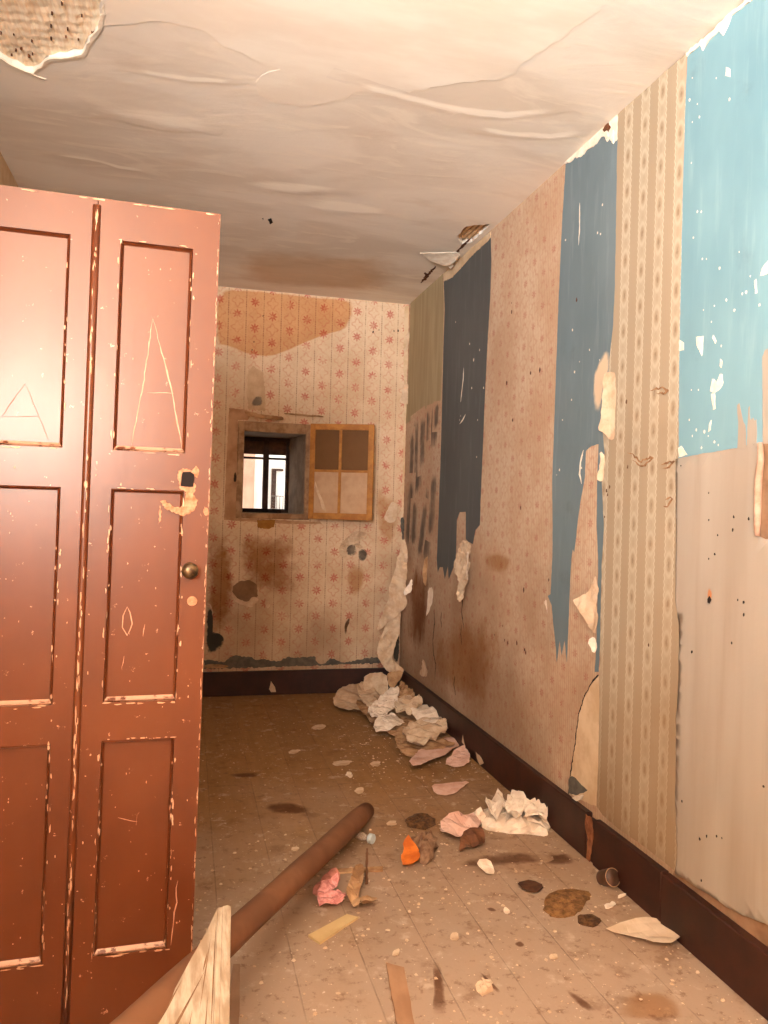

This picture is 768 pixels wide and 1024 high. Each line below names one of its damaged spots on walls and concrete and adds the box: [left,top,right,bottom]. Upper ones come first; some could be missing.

damp [216,244,418,358]
peeling [678,0,768,539]
peeling [0,0,618,862]
damp [205,527,304,656]
damp [345,545,368,599]
damp [373,400,514,717]
spalling [41,904,70,1008]